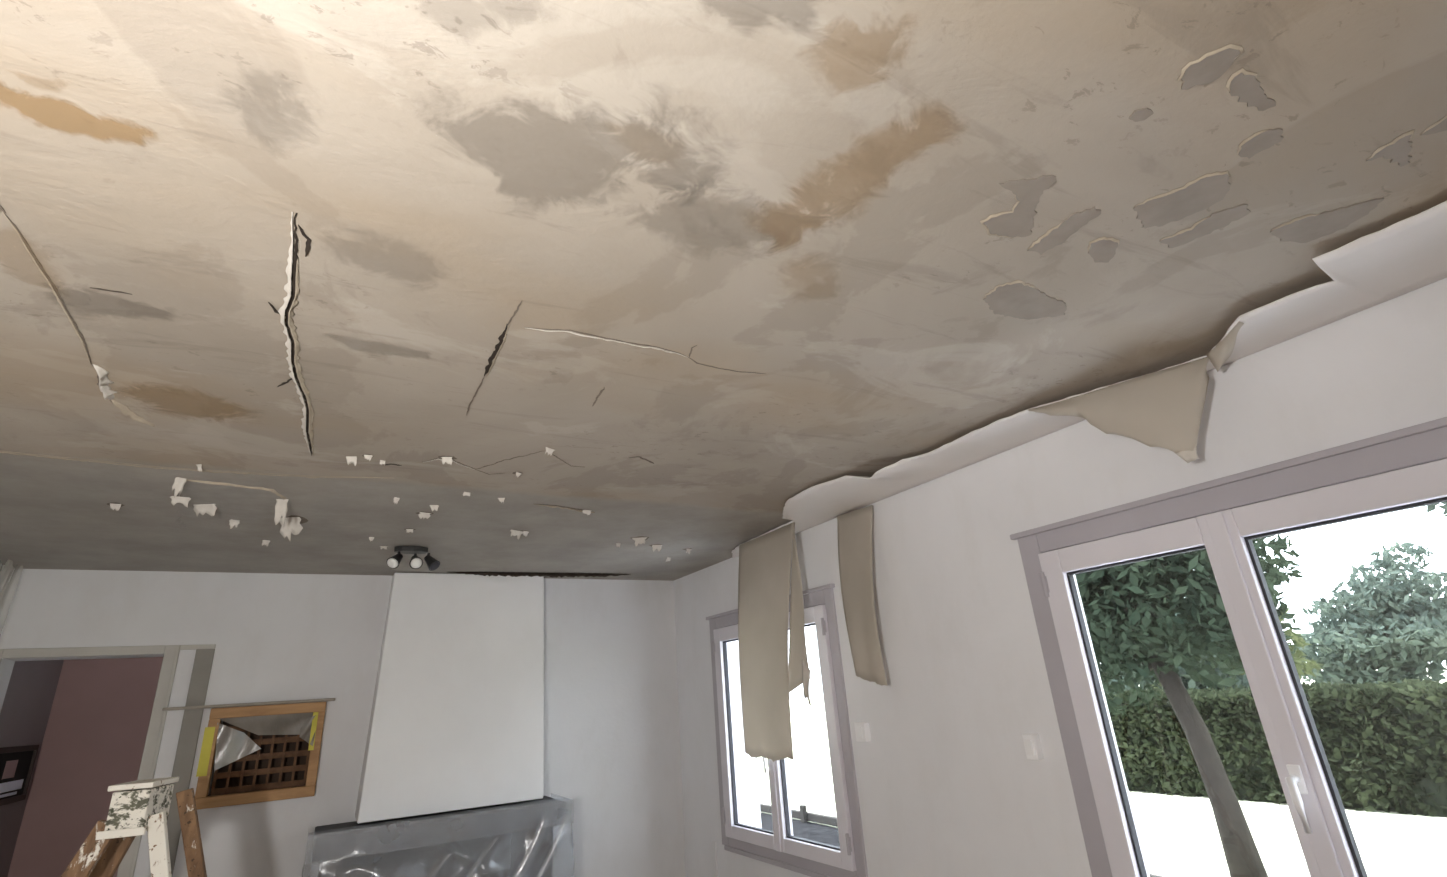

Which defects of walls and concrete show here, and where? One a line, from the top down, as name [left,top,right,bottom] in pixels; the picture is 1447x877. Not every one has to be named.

peeling [1177,44,1276,111]
leakage [0,85,151,144]
peeling [1237,128,1284,159]
peeling [980,175,1120,263]
peeling [1133,171,1251,248]
peeling [1271,198,1384,243]
peeling [983,280,1067,320]
crack [268,212,315,456]
crack [466,301,765,416]